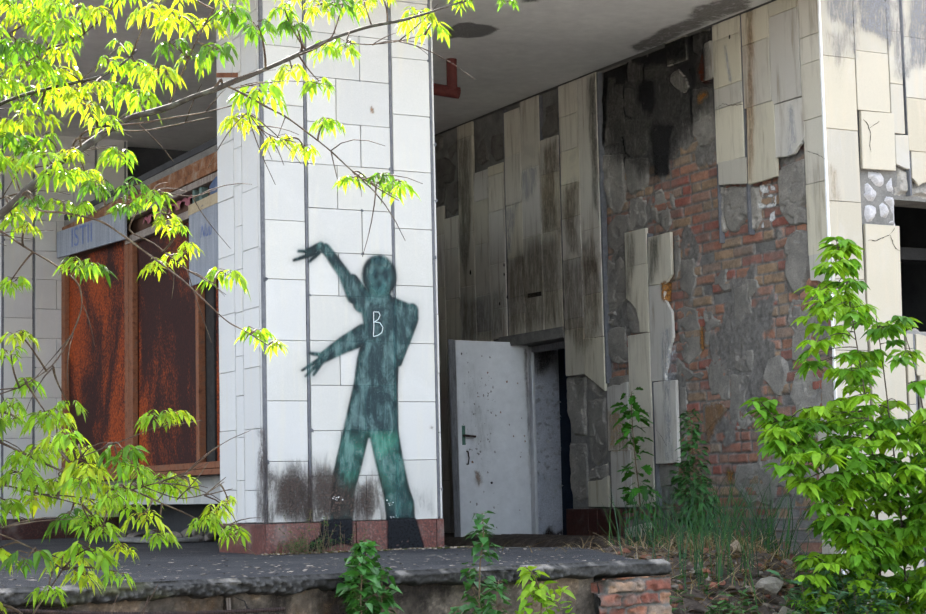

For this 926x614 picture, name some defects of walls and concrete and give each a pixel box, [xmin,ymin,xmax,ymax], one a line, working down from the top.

peeling [633,0,750,54]
leakage [828,0,926,65]
leakage [589,77,598,203]
flaking render [692,87,715,147]
flaking render [535,60,698,502]
flaking render [659,159,834,506]
leakage [258,430,382,524]